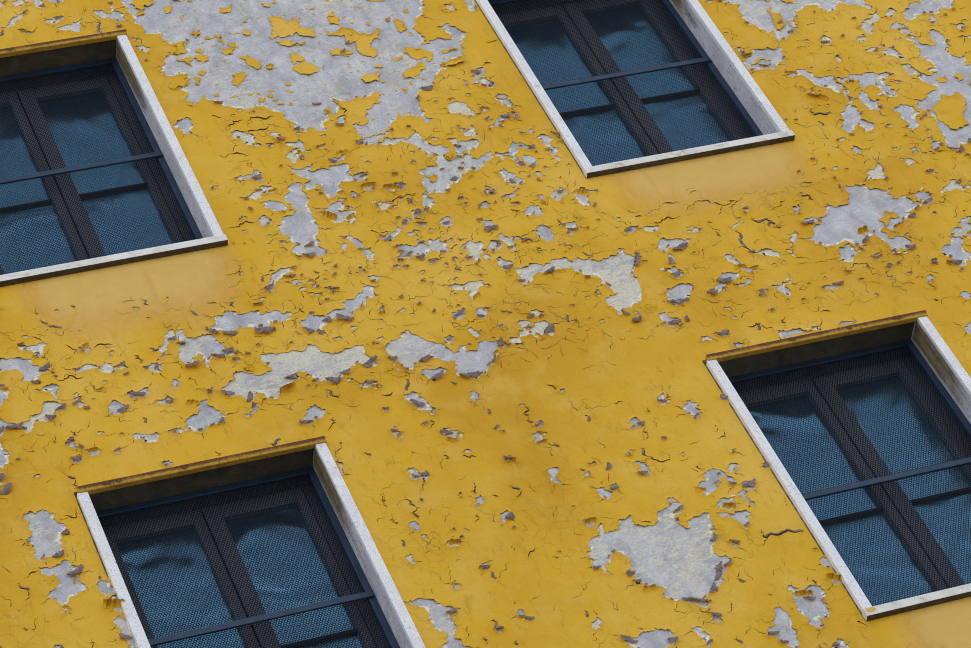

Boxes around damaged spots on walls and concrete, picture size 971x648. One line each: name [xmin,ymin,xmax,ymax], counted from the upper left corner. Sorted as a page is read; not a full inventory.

peeling [0,0,971,503]
crack [22,410,179,454]
crack [371,364,432,396]
crack [522,405,534,427]
crack [547,383,622,422]
crack [639,368,704,472]
crack [46,475,78,518]
crack [440,452,534,522]
crack [481,525,568,579]
peeling [577,447,759,648]
peeling [403,579,479,648]
crack [514,584,644,647]